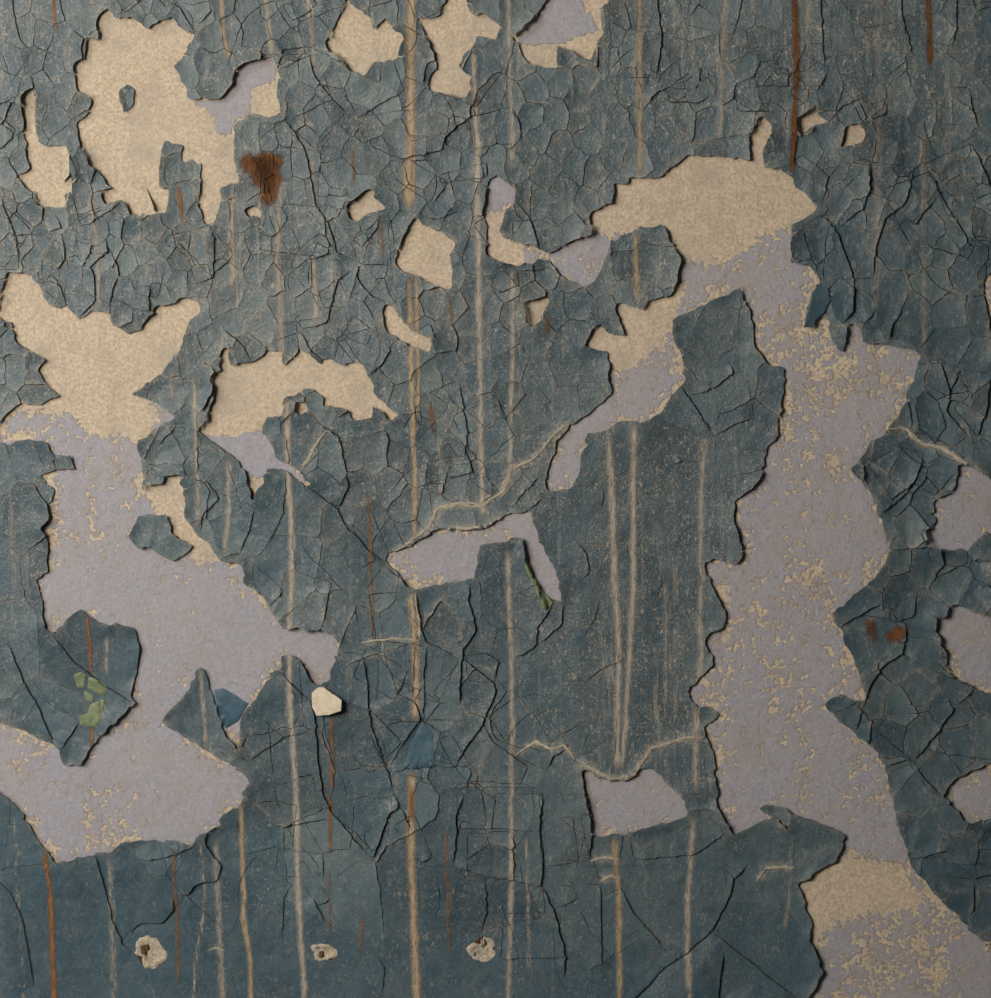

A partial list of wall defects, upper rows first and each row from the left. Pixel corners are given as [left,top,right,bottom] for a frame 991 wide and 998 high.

crack [45,202,158,317]
peeling [3,0,290,237]
rust [240,152,283,204]
crack [259,47,476,359]
peeling [291,0,627,125]
rust [790,0,800,169]
rust [925,0,933,64]
peeling [0,174,480,864]
crack [238,420,572,560]
peeling [372,66,991,998]
crack [868,358,991,513]
rust [43,855,57,998]